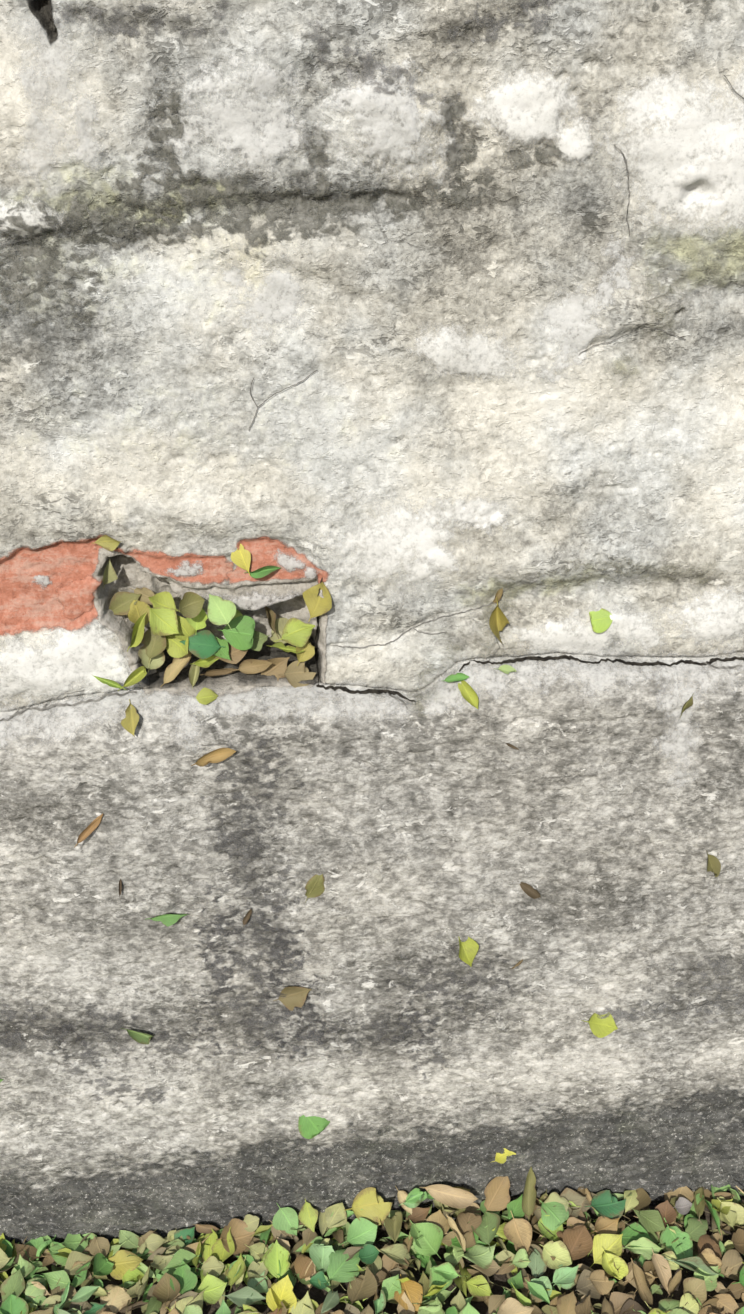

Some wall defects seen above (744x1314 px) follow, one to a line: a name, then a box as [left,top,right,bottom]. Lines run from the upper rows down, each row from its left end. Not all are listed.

spalling [27,0,58,44]
crack [0,690,137,721]
spalling [0,489,507,703]
crack [314,578,537,710]
crack [459,636,744,672]
water stain [0,1086,744,1248]